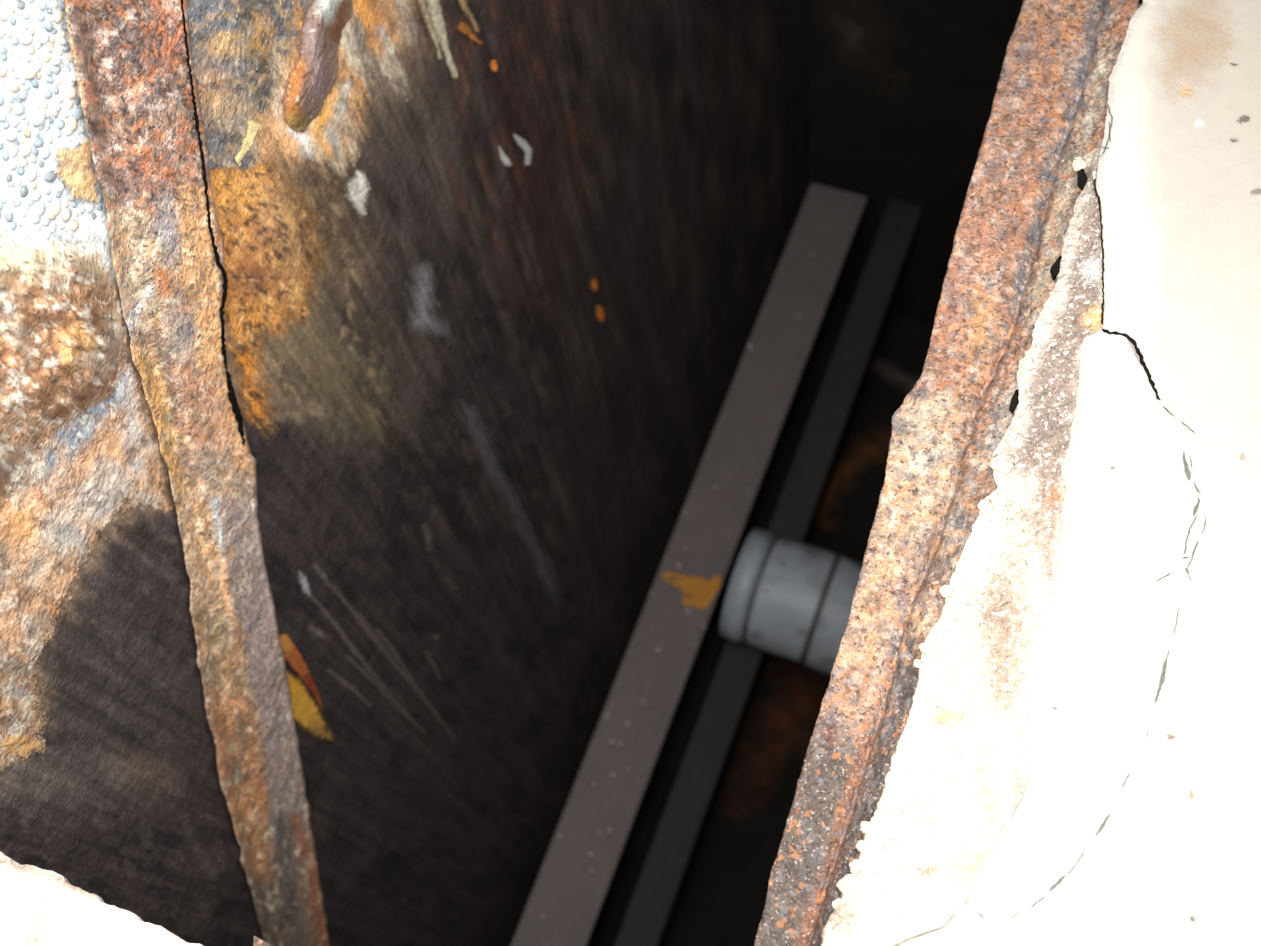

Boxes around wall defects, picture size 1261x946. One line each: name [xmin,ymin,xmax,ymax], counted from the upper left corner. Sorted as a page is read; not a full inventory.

rust [54,143,99,203]
crack [181,0,246,446]
rust [209,0,482,432]
crack [1092,81,1206,582]
rust [0,359,172,772]
rust [280,634,334,743]
rust [661,572,722,609]
spalling [821,139,1105,946]
crack [978,773,1130,919]
crack [1155,608,1179,703]